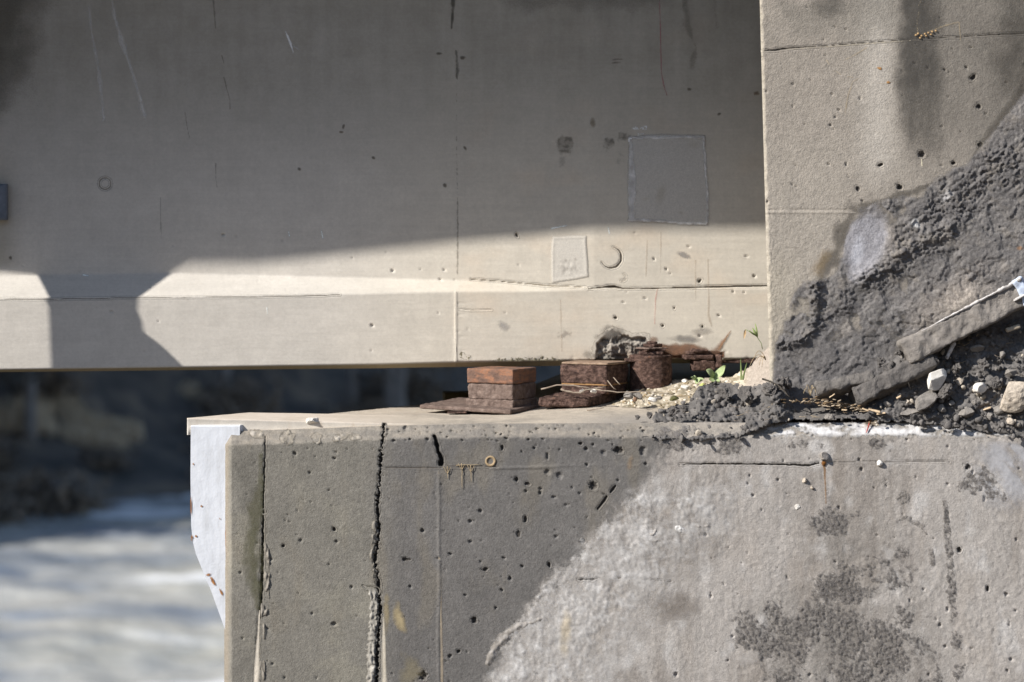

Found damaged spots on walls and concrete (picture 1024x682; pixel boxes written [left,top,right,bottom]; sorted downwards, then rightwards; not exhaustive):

leakage [866,0,937,100]
leakage [820,224,849,277]
spalling [591,326,652,359]
crack [678,459,952,468]
crack [361,422,499,682]